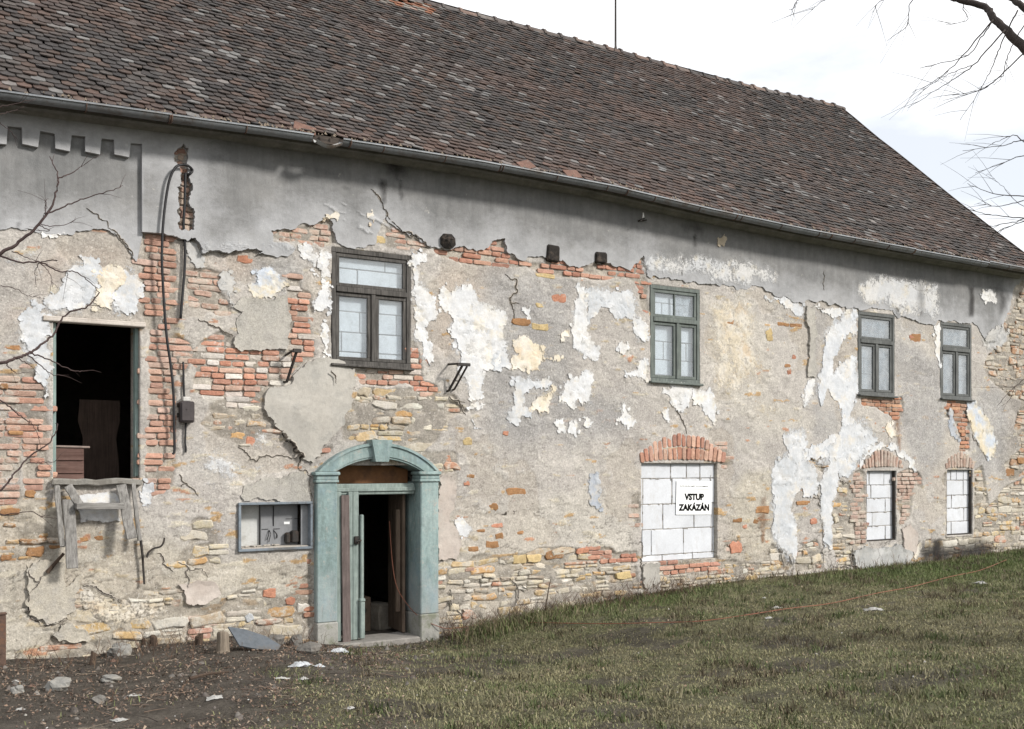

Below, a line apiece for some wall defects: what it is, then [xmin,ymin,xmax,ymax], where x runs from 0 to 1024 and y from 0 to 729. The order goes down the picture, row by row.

crack [87,208,133,259]
crack [371,189,431,247]
peeling [347,227,651,452]
crack [505,274,519,326]
flaking render [0,149,340,657]
crack [240,423,313,497]
flaking render [434,455,460,471]
peeling [660,295,922,591]
flaking render [914,292,1024,562]
flaking render [438,546,644,635]